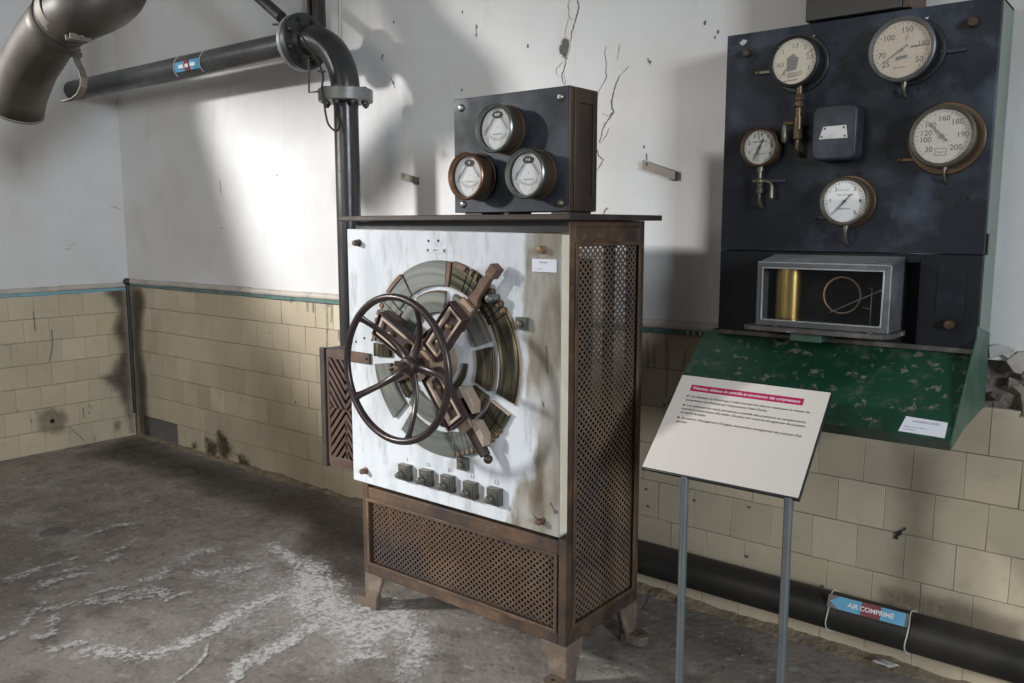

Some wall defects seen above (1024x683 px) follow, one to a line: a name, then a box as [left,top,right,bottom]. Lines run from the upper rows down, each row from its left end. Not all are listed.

crack [556,0,579,84]
crack [597,44,629,168]
water stain [108,290,148,435]
spalling [989,344,1024,418]
water stain [193,431,250,466]
water stain [0,541,437,683]